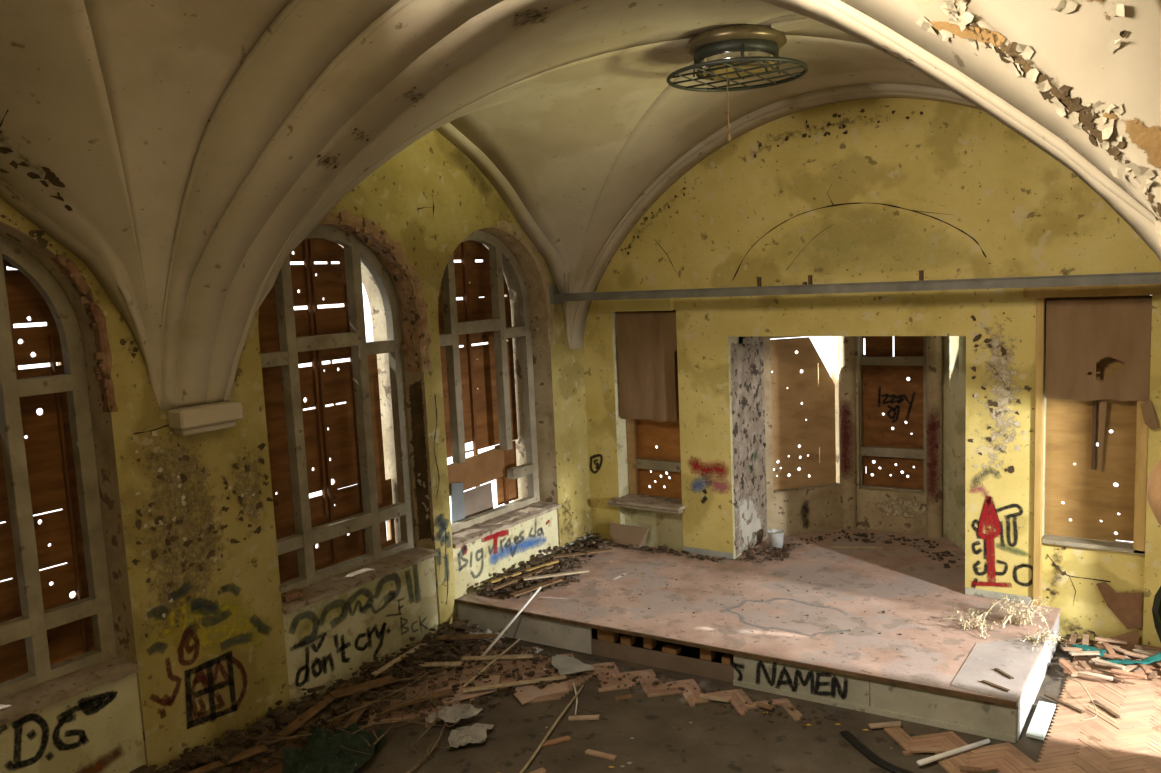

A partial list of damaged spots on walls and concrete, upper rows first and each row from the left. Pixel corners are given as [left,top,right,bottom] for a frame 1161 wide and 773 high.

spalling [916,0,1161,235]
crack [733,191,986,280]
peeling [131,431,275,638]
spalling [731,342,766,556]
peeling [967,312,1032,474]